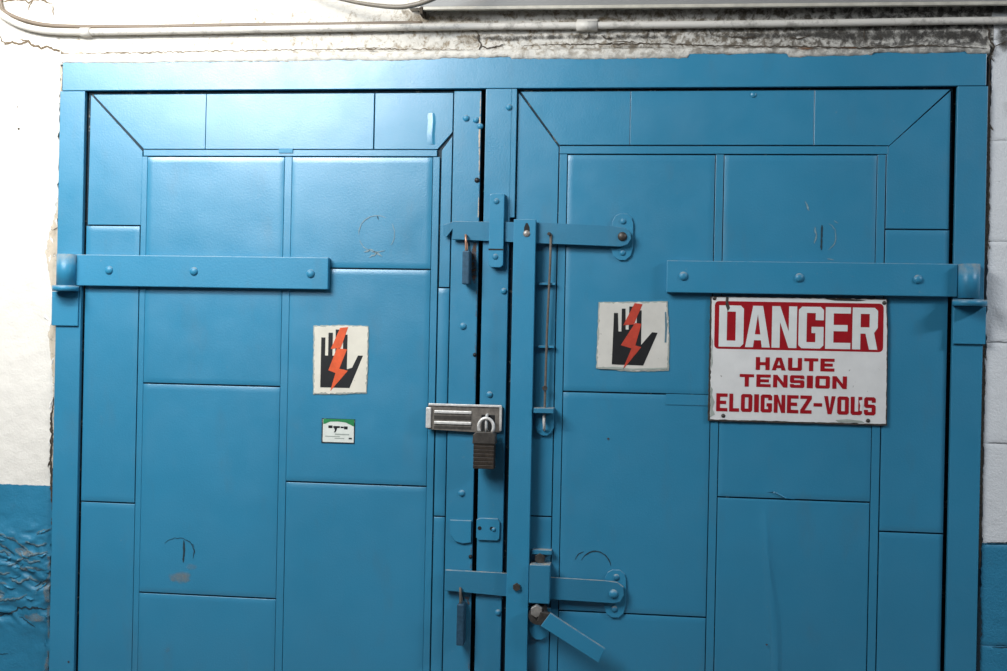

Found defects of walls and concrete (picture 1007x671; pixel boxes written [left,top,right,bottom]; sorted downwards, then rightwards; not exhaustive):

leakage [458,34,670,43]
leakage [696,30,981,41]
leakage [999,28,1007,49]